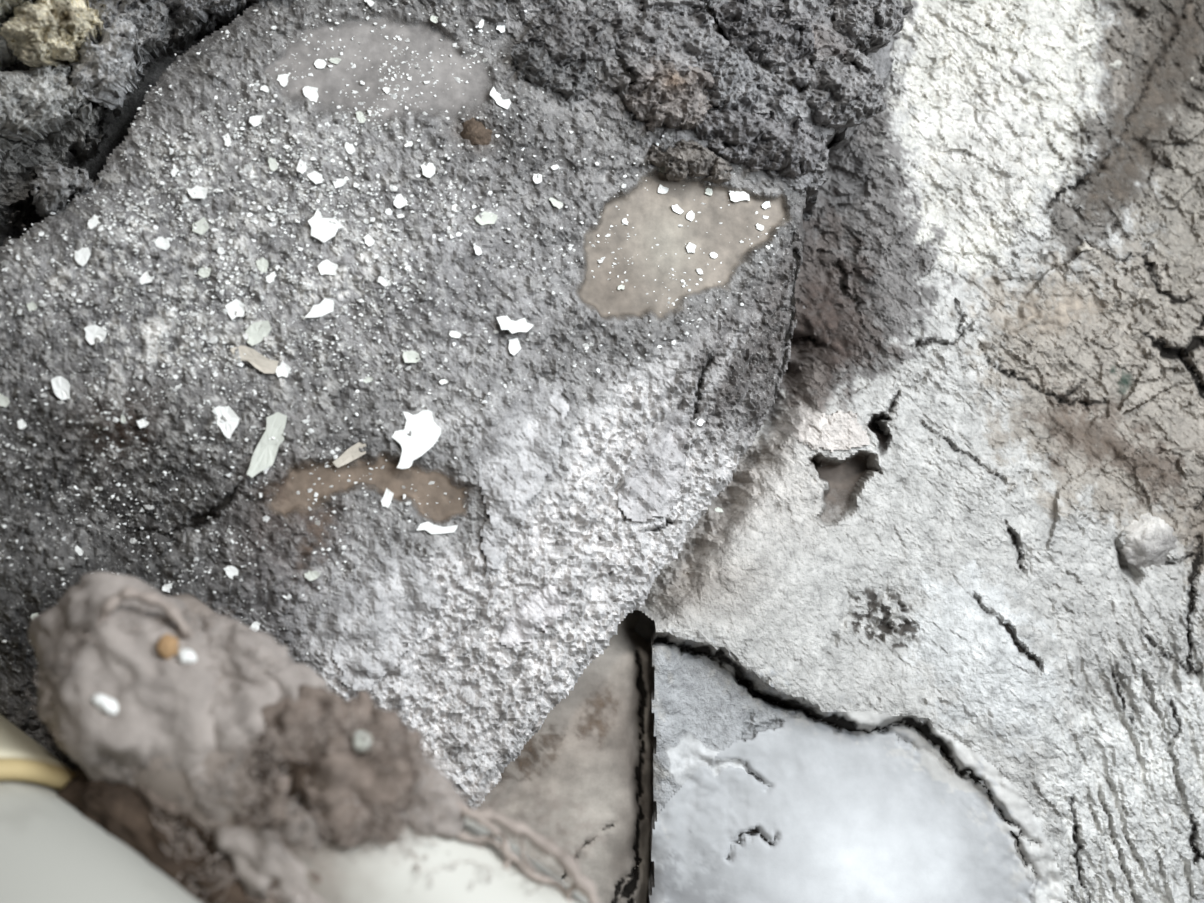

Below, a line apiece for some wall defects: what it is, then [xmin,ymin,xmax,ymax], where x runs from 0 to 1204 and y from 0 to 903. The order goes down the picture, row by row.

spalling [577,167,789,318]
crack [1122,253,1204,398]
crack [984,354,1105,406]
peeling [270,381,569,577]
peeling [779,406,890,514]
crack [974,596,1041,670]
crack [1005,521,1024,572]
crack [1141,495,1204,675]
crack [561,637,1037,903]
crack [1168,700,1180,745]
crack [1063,797,1091,903]
crack [1189,816,1204,863]